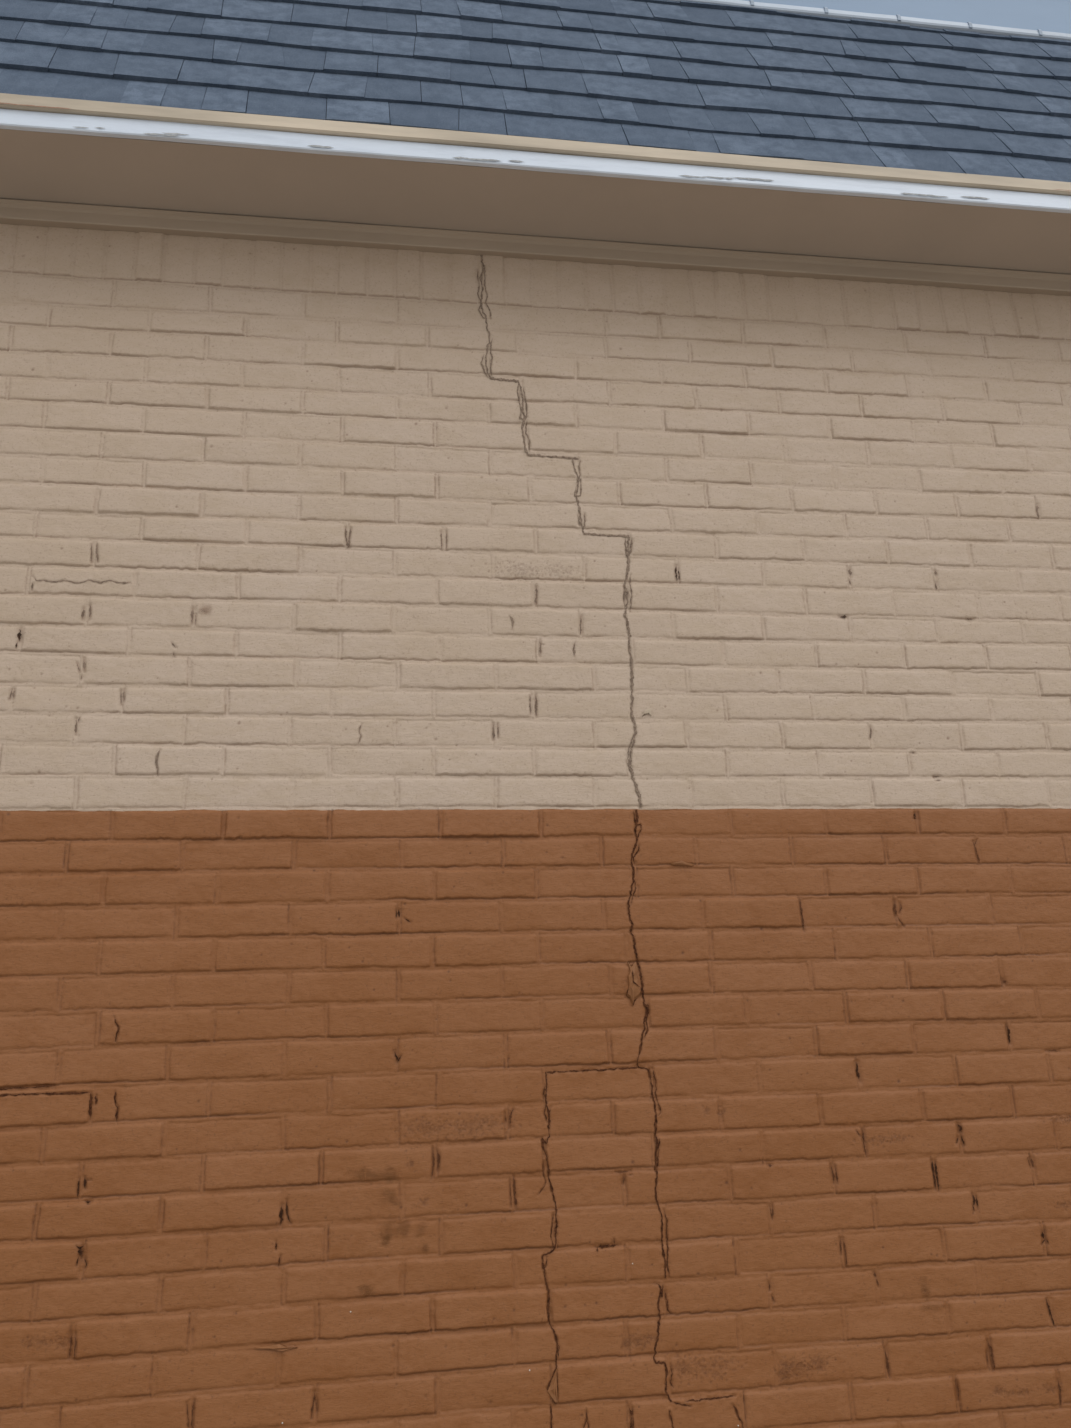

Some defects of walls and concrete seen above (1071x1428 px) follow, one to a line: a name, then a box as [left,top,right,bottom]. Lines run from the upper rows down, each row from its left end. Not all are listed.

crack [31,579,128,588]
crack [477,255,743,1428]
crack [0,1085,118,1120]